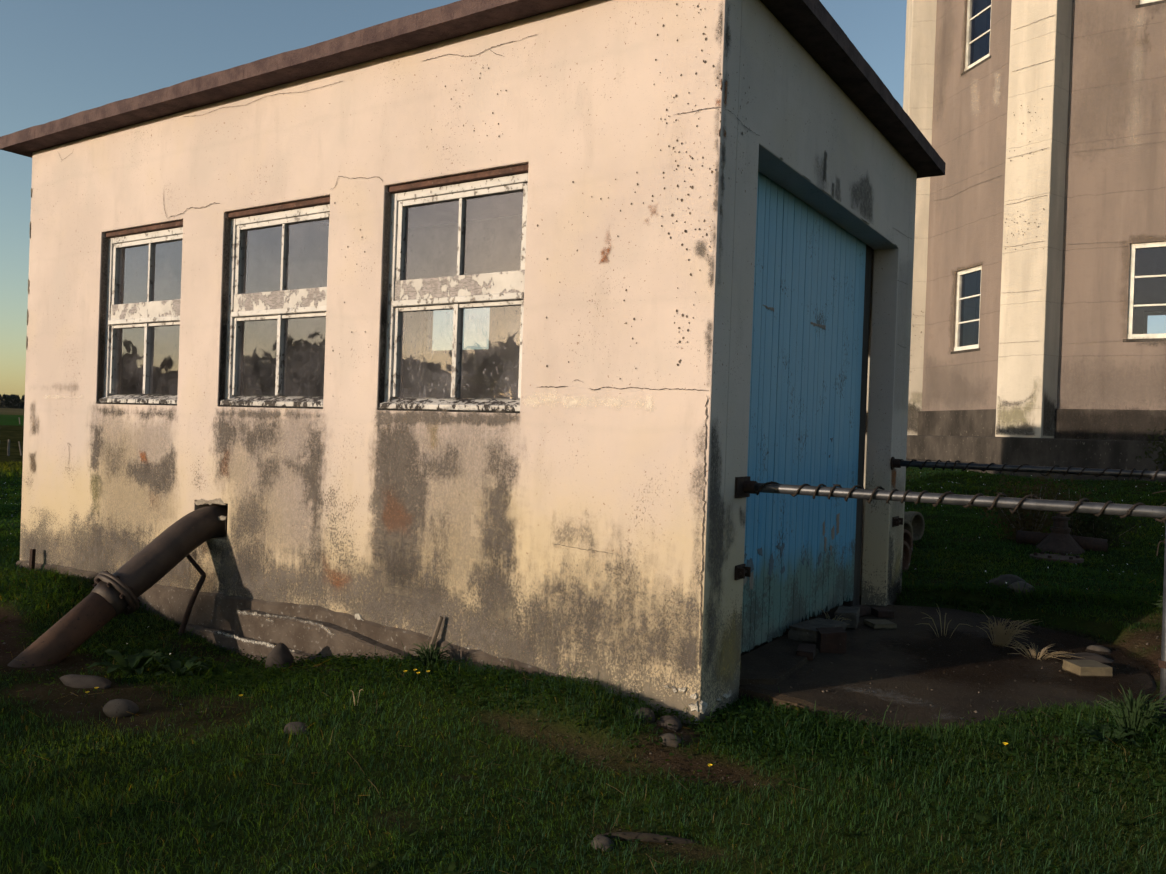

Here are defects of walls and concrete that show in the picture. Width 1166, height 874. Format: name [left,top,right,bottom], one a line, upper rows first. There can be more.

crack [423,34,537,61]
water stain [97,237,124,416]
water stain [696,234,715,281]
water stain [823,151,873,218]
water stain [23,427,175,574]
water stain [159,192,575,674]
water stain [546,564,635,643]
crack [541,379,709,669]
water stain [620,426,745,672]